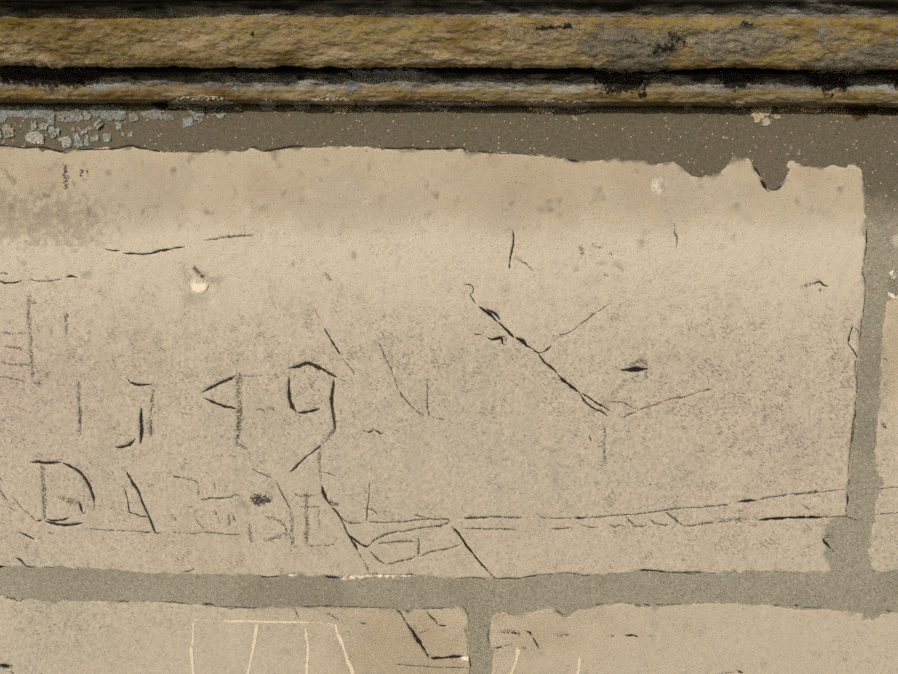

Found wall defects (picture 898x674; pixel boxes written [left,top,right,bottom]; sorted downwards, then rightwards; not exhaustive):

crack [479,306,610,415]